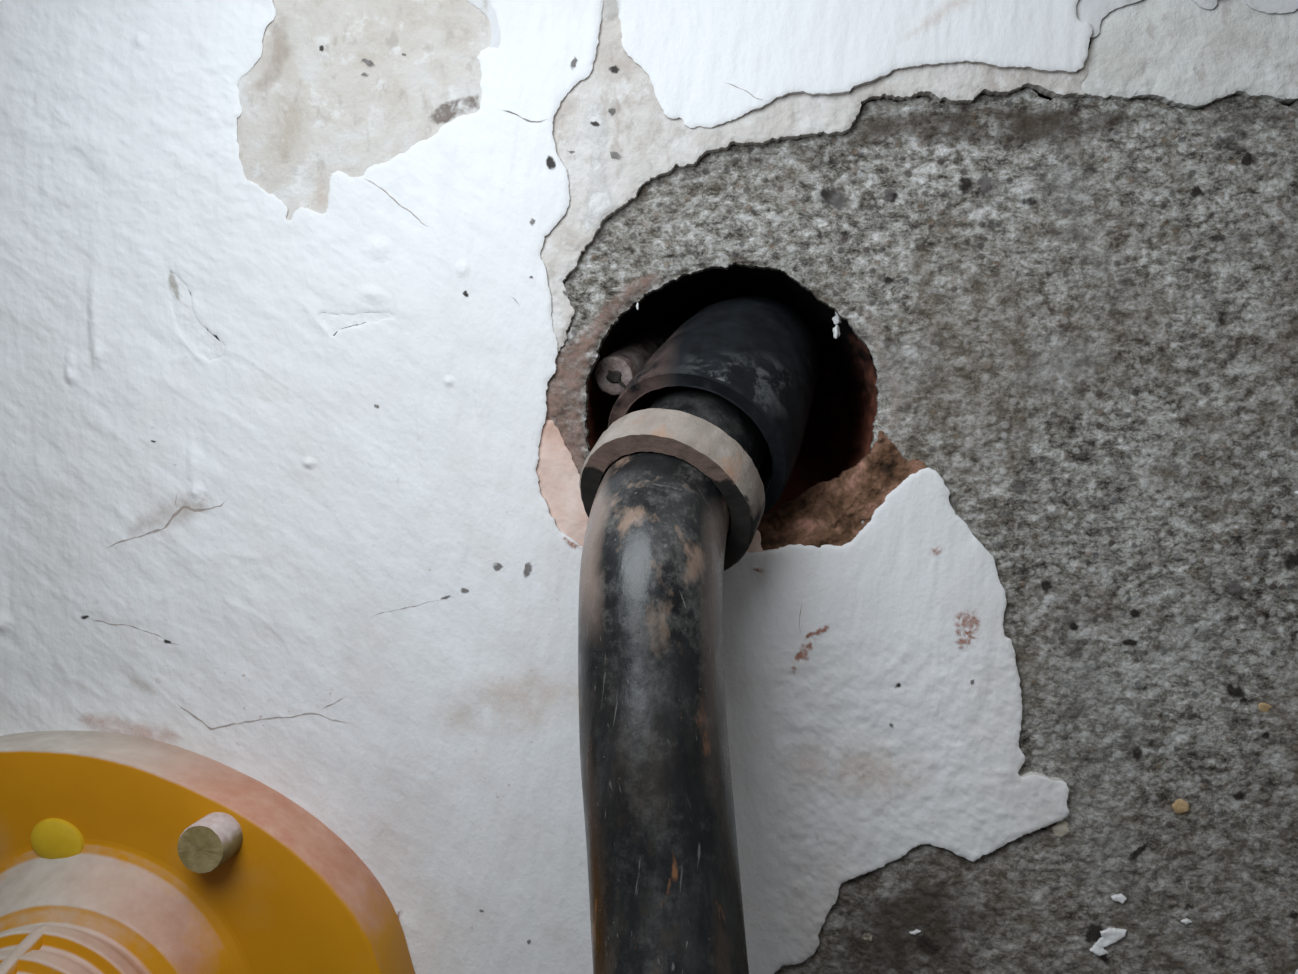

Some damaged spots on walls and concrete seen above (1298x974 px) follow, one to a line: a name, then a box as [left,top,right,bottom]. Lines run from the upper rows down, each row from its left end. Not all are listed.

peeling [237,0,501,221]
spalling [530,0,1298,974]
crack [112,503,221,546]
corrosion [793,627,828,669]
corrosion [957,614,978,644]
crack [182,699,341,730]